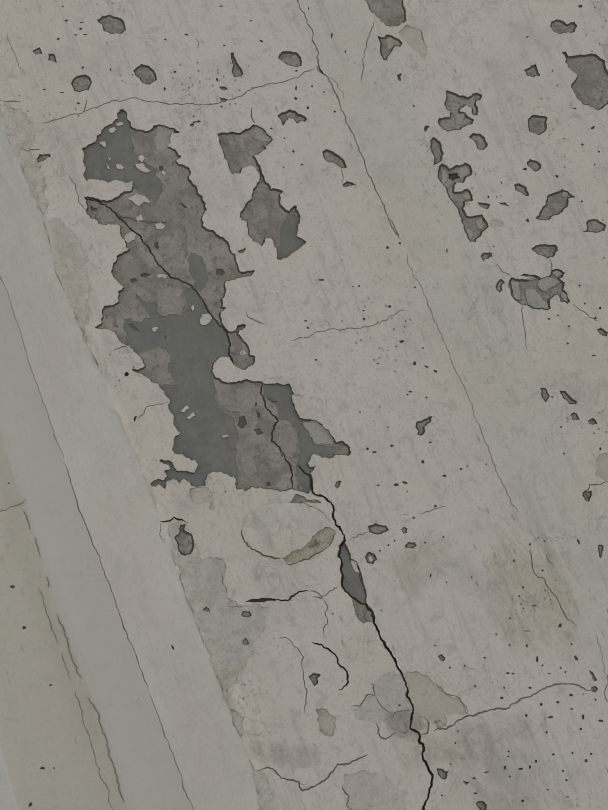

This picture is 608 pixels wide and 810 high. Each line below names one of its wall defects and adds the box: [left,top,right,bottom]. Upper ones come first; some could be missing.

spalling [97,15,126,34]
spalling [133,64,157,85]
spalling [278,51,302,72]
peeling [365,0,427,60]
spalling [562,44,608,110]
spalling [424,90,508,242]
crack [46,0,518,512]
peeling [0,99,351,510]
spalling [496,269,570,320]
spalling [167,521,270,691]
crack [222,384,608,810]
peeling [353,671,467,732]